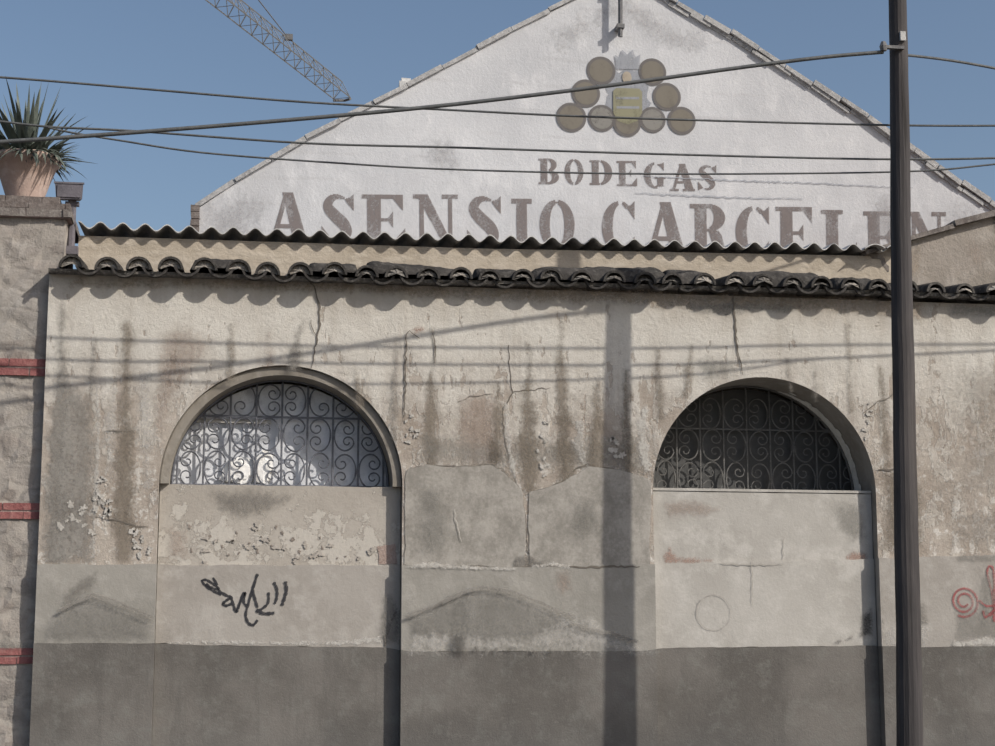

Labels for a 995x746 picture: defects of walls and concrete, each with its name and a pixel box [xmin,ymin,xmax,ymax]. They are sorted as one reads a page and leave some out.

leakage [44,342,92,562]
flaking render [57,386,113,558]
leakage [114,324,135,560]
crack [310,282,321,368]
crack [403,330,436,421]
crack [410,345,614,555]
leakage [518,378,538,492]
leakage [556,351,574,482]
crack [732,292,743,375]
leakage [880,381,894,546]
flaking render [128,527,154,559]
flaking render [190,521,397,565]